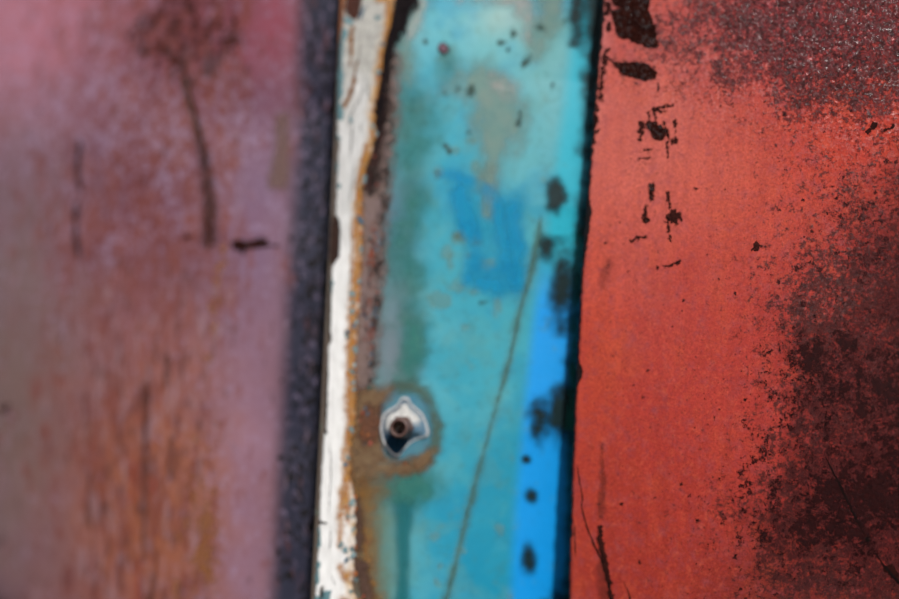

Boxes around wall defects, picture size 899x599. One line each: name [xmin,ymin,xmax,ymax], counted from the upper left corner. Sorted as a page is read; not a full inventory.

peeling [604,0,659,48]
peeling [336,0,366,139]
peeling [608,57,660,92]
rust [127,0,261,247]
peeling [637,103,678,165]
peeling [330,216,340,265]
peeling [641,183,655,224]
peeling [665,191,683,242]
rust [335,0,444,599]
peeling [338,541,356,563]
crack [574,467,631,599]
peeling [314,561,331,599]